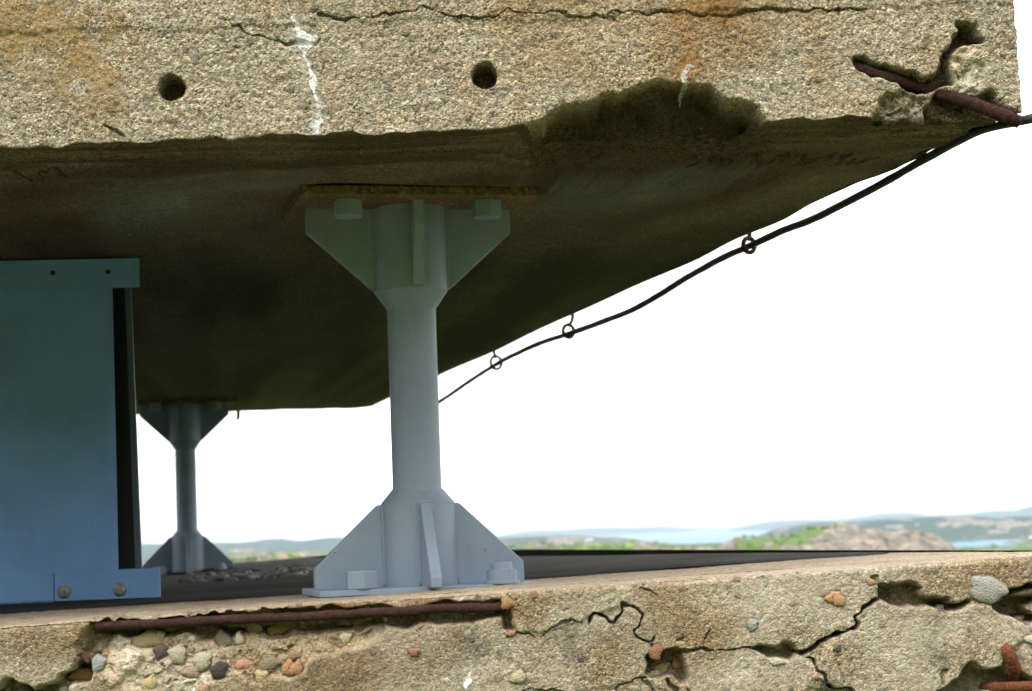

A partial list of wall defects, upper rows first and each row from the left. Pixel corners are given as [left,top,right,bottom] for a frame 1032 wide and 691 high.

damp [0,3,114,90]
crack [224,0,868,48]
damp [288,9,323,135]
spalling [852,21,1022,137]
spalling [519,81,797,203]
spalling [94,602,503,632]
crack [3,560,901,691]
spalling [874,581,970,612]
spalling [991,582,1032,623]
spalling [0,663,82,691]
crack [940,668,949,687]